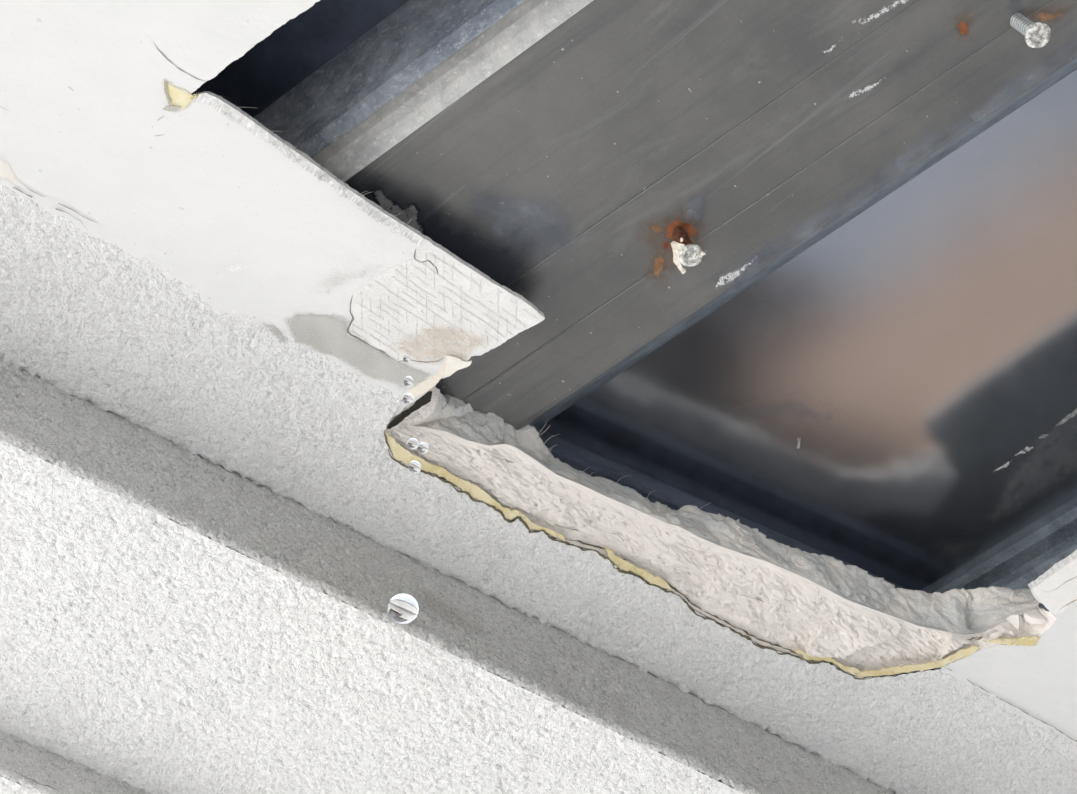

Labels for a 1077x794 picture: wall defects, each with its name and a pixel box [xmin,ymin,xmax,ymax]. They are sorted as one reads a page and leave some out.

corrosion [650,219,697,278]
flaking render [347,249,1077,680]